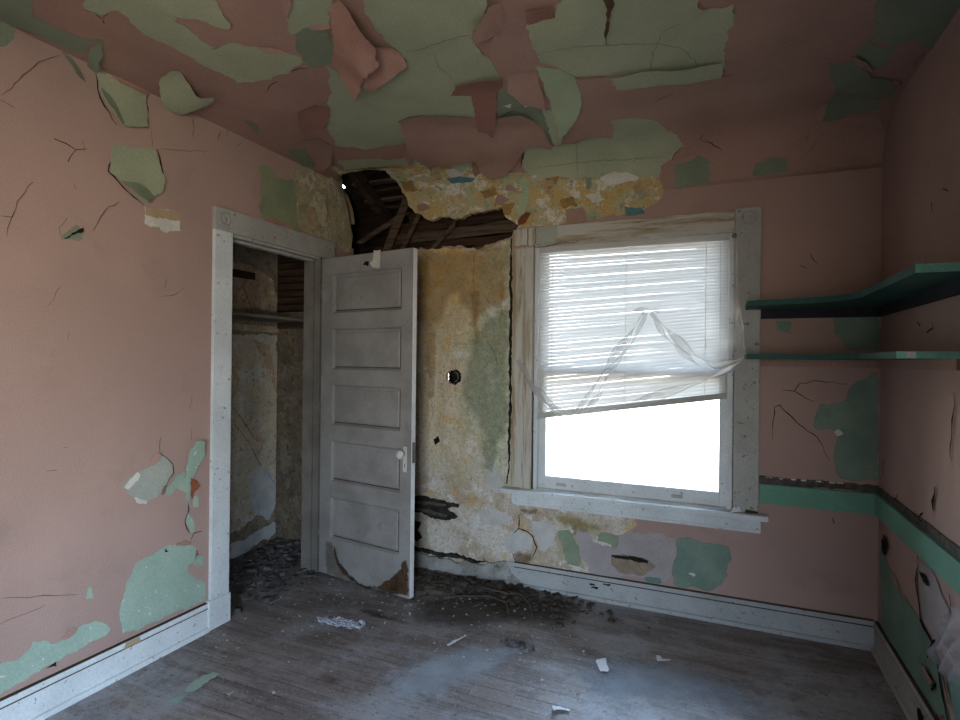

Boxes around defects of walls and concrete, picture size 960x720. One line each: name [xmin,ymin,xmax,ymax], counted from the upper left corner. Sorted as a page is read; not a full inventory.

crack [2,56,56,108]
peeling [0,0,214,128]
peeling [83,0,735,253]
flaking render [414,240,731,591]
crack [772,380,839,460]
peeling [814,373,879,481]
peeling [119,440,206,633]
peeling [0,621,110,694]
peeling [880,535,960,720]